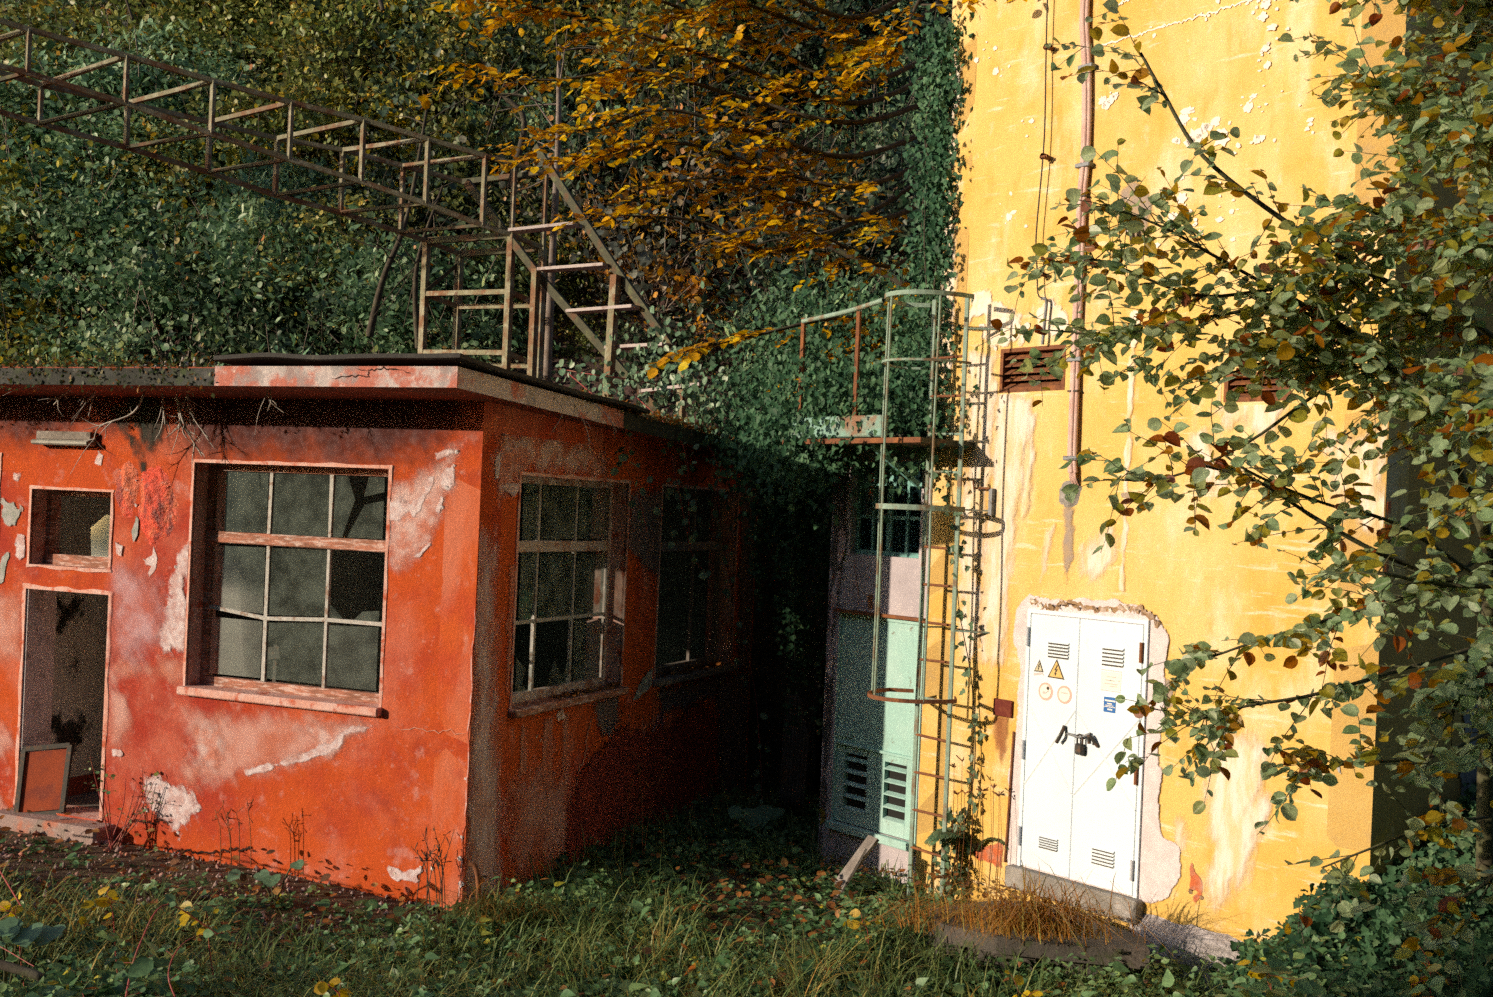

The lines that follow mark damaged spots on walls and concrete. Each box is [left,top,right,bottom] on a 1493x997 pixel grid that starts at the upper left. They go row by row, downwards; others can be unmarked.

damp [947,45,962,170]
peeling [1099,0,1290,155]
flaking render [115,516,138,556]
peeling [389,448,458,570]
peeling [495,436,606,496]
damp [938,190,1034,664]
peeling [143,544,189,652]
peeling [244,722,371,775]
peeling [142,775,201,834]
damp [1204,723,1270,907]
flaking render [387,865,437,910]